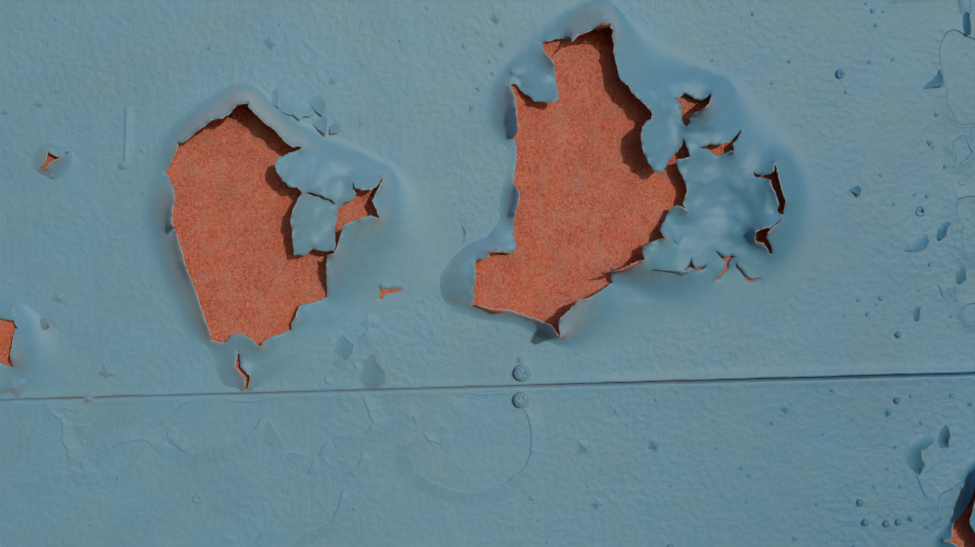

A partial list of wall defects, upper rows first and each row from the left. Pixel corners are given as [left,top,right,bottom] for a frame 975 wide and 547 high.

peeling [31,139,84,179]
peeling [140,0,823,391]
peeling [0,297,76,395]
peeling [904,424,952,475]
peeling [924,454,975,547]